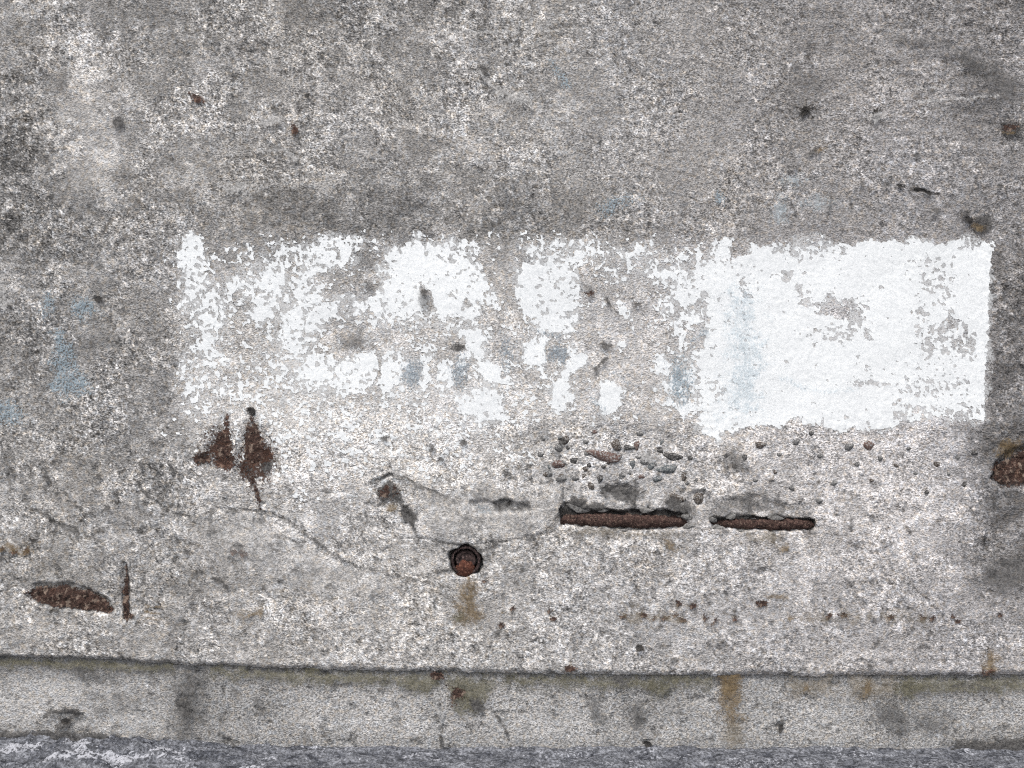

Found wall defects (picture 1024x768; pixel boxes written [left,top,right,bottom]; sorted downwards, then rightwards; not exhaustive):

peeling [161,229,997,532]
rust [192,407,281,510]
rust [991,439,1024,488]
crack [137,461,564,589]
rust [24,564,157,622]